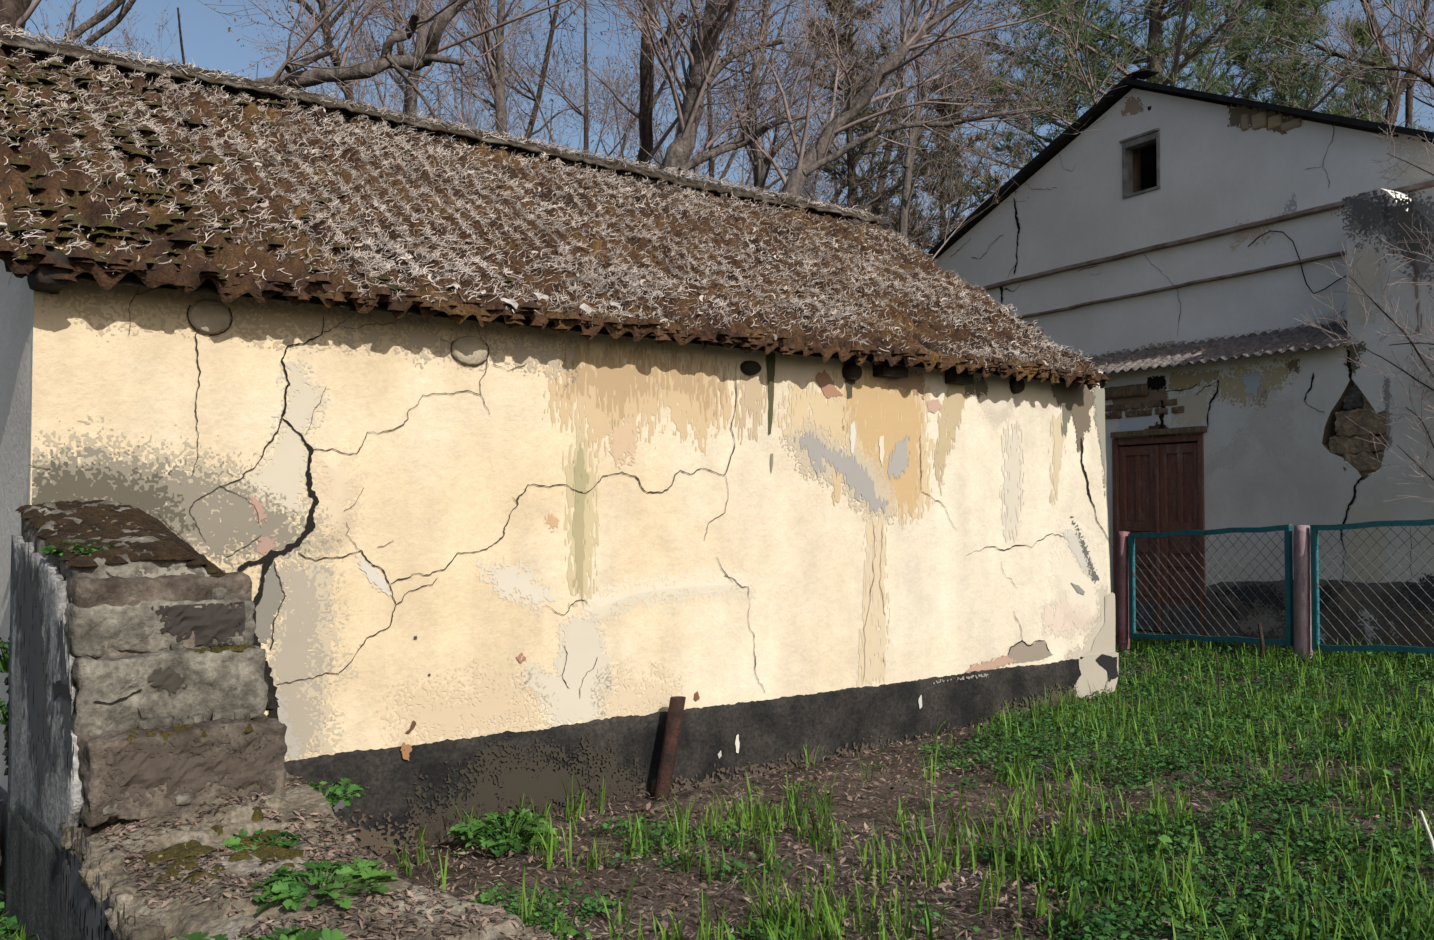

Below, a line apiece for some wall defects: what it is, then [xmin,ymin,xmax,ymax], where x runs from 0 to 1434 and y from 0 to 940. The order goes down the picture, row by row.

spalling [1226,104,1303,135]
crack [950,155,1077,303]
leakage [1282,112,1434,331]
leakage [31,415,361,812]
crack [128,286,765,718]
leakage [843,360,856,399]
leakage [933,370,989,496]
crack [920,436,1064,655]
spalling [918,516,1119,708]
crack [1081,438,1114,550]
spalling [1061,369,1220,498]
spalling [1322,341,1393,480]